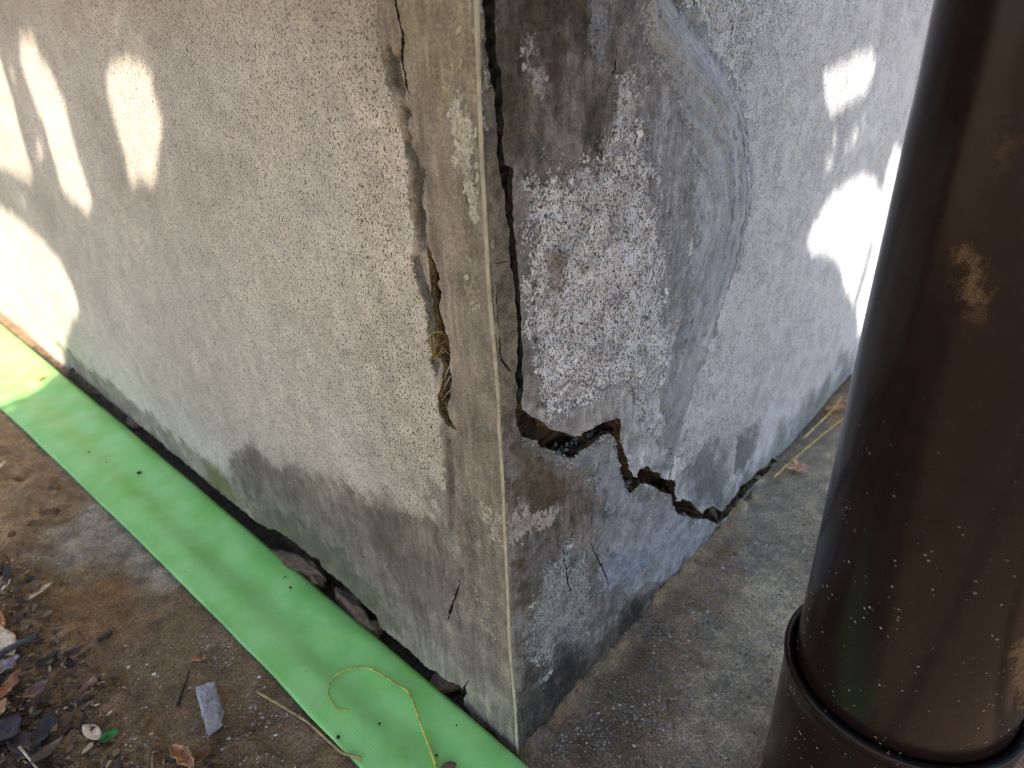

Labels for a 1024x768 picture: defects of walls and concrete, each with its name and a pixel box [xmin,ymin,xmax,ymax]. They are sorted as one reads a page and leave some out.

crack [395,0,410,96]
peeling [515,33,553,104]
crack [427,244,456,429]
peeling [518,109,680,425]
crack [482,0,777,524]
crack [447,580,460,620]